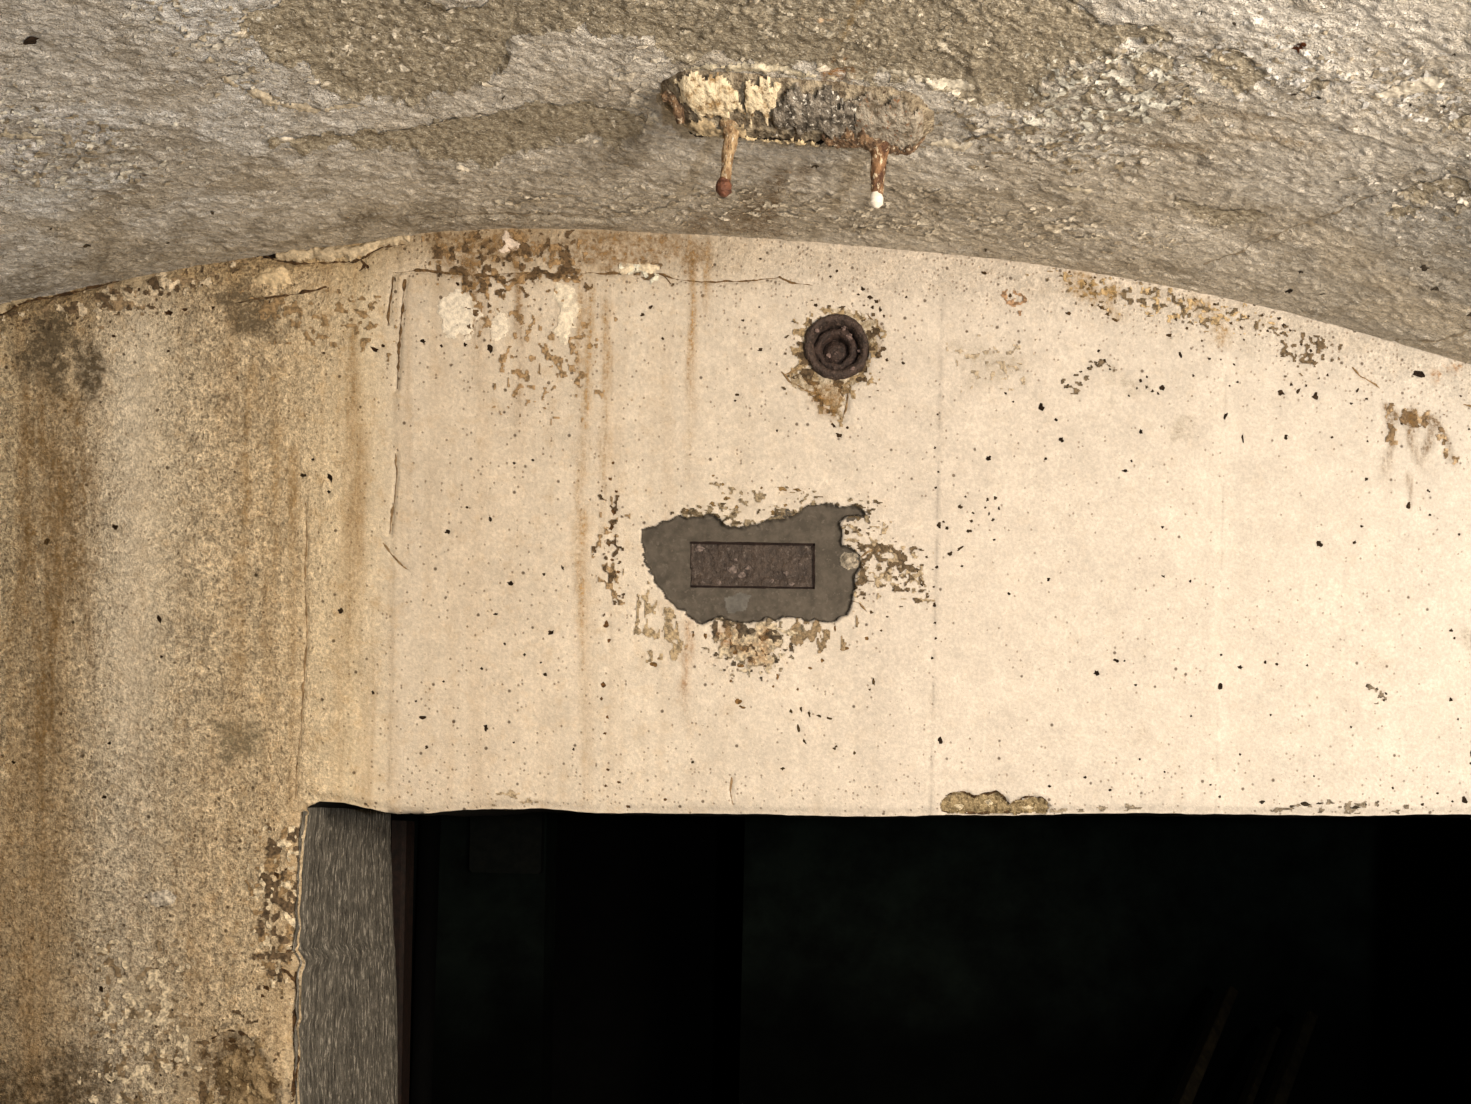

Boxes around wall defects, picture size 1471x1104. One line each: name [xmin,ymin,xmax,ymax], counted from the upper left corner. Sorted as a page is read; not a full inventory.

damp [13,310,105,394]
rust [570,168,811,359]
peeling [592,461,1000,709]
spalling [240,819,303,1005]
damp [0,1064,111,1104]